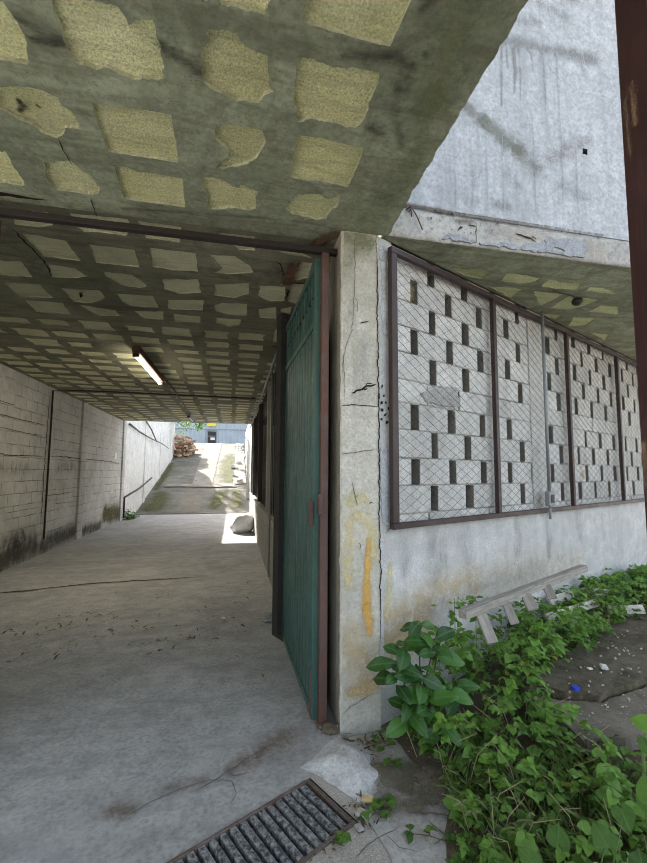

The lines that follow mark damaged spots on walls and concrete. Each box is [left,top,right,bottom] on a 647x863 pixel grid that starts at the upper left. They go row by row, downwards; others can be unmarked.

peeling [0,1,28,60]
peeling [53,0,163,76]
peeling [200,29,270,99]
damp [501,38,596,90]
peeling [0,86,79,135]
peeling [93,103,178,160]
damp [480,117,540,170]
crack [342,235,382,655]
damp [0,523,100,572]
rust [345,538,380,696]